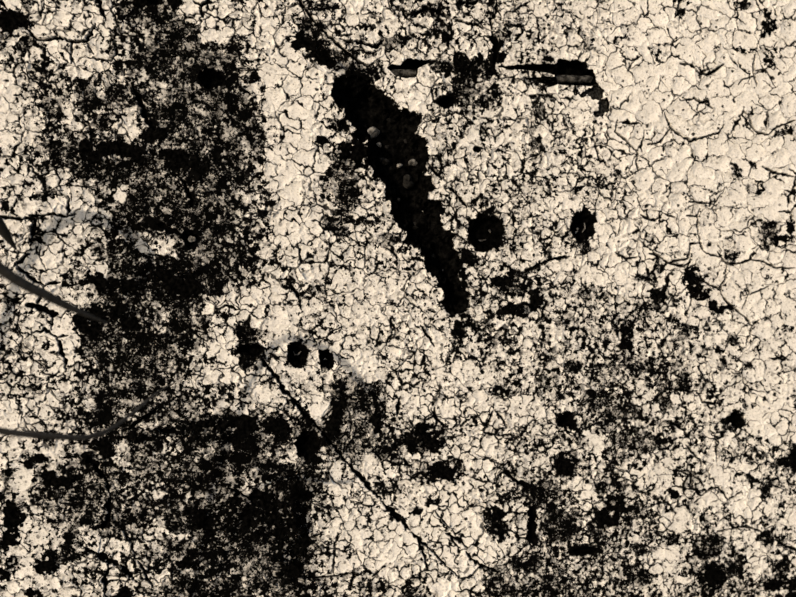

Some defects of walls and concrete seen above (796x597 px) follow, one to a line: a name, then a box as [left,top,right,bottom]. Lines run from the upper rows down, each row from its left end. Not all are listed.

spalling [502,60,607,117]
leakage [76,124,209,184]
crack [1,199,76,371]
leakage [72,261,204,342]
spalling [331,77,469,316]
spalling [467,215,503,251]
crack [617,202,790,324]
spalling [287,343,307,368]
leakage [183,413,300,440]
crack [262,359,495,578]
crack [80,533,154,597]
leakage [184,480,317,591]